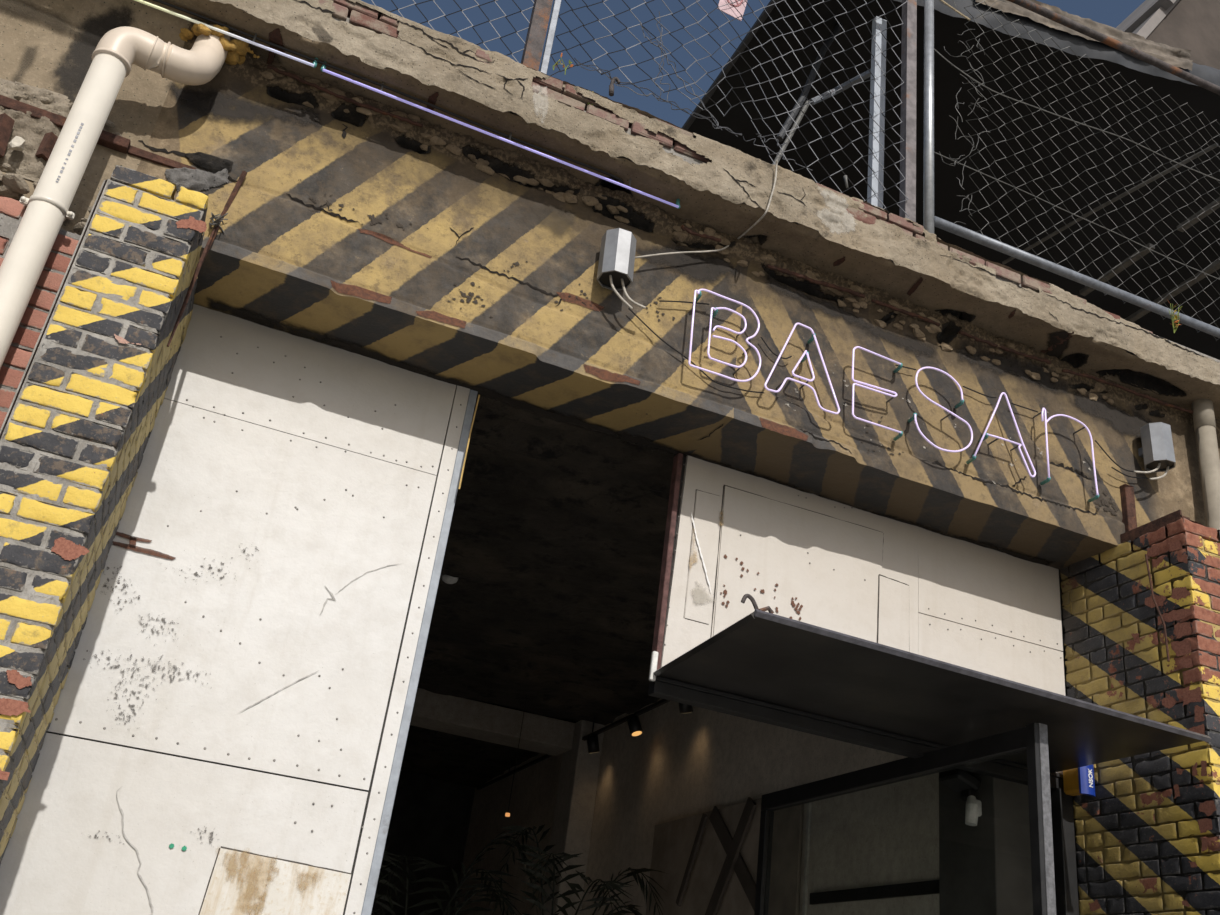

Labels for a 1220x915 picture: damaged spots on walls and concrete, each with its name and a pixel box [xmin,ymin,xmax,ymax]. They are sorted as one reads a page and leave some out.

crack [397,20,528,97]
spalling [0,78,70,184]
crack [138,140,237,191]
crack [288,194,358,222]
spalling [261,68,655,233]
crack [723,168,807,209]
spalling [672,223,1187,418]
crack [924,460,1099,515]
rust [113,532,175,560]
peeling [1145,587,1193,668]
peeling [1162,687,1205,735]